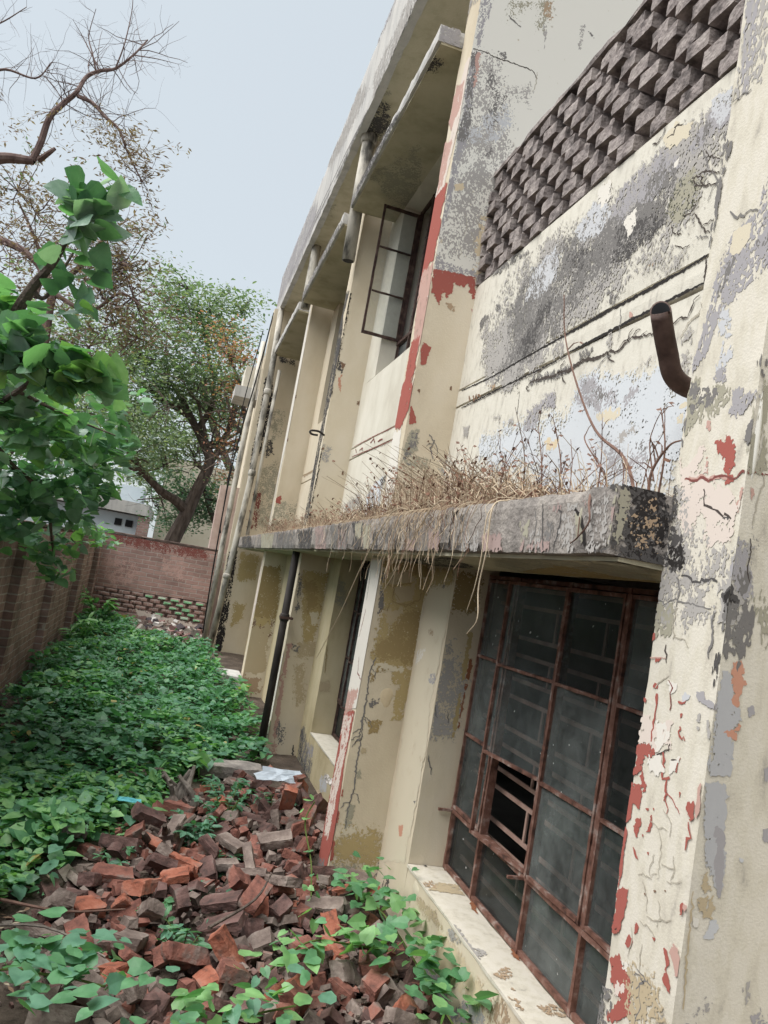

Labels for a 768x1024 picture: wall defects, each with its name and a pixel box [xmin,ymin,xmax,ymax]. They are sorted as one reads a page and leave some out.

damp [328,0,426,209]
peeling [663,121,693,168]
peeling [318,0,643,866]
damp [434,0,768,686]
crack [461,150,758,408]
crack [685,469,768,582]
damp [292,570,347,707]
damp [297,728,327,798]
crack [341,658,376,829]
peeling [606,661,755,1024]